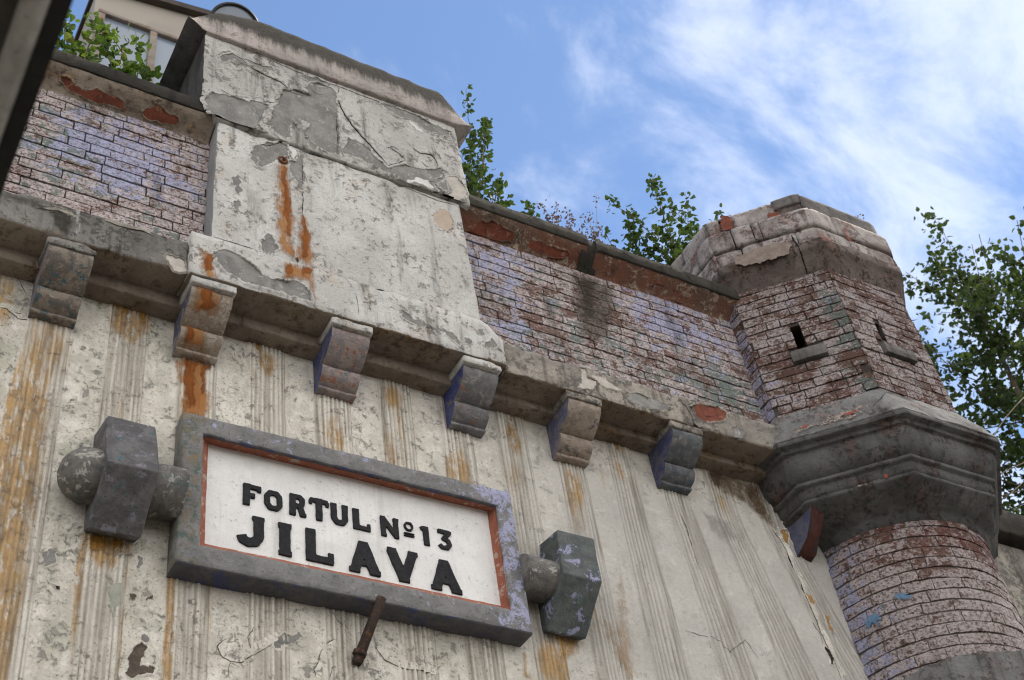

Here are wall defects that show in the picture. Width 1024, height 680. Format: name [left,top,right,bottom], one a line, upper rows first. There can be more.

peeling [58,73,127,112]
peeling [140,101,181,126]
crack [215,50,450,229]
peeling [200,74,572,260]
peeling [209,247,315,306]
corrosion [276,163,314,293]
peeling [735,242,792,266]
corrosion [176,326,211,416]
peeling [689,402,747,440]
spalling [122,632,158,680]